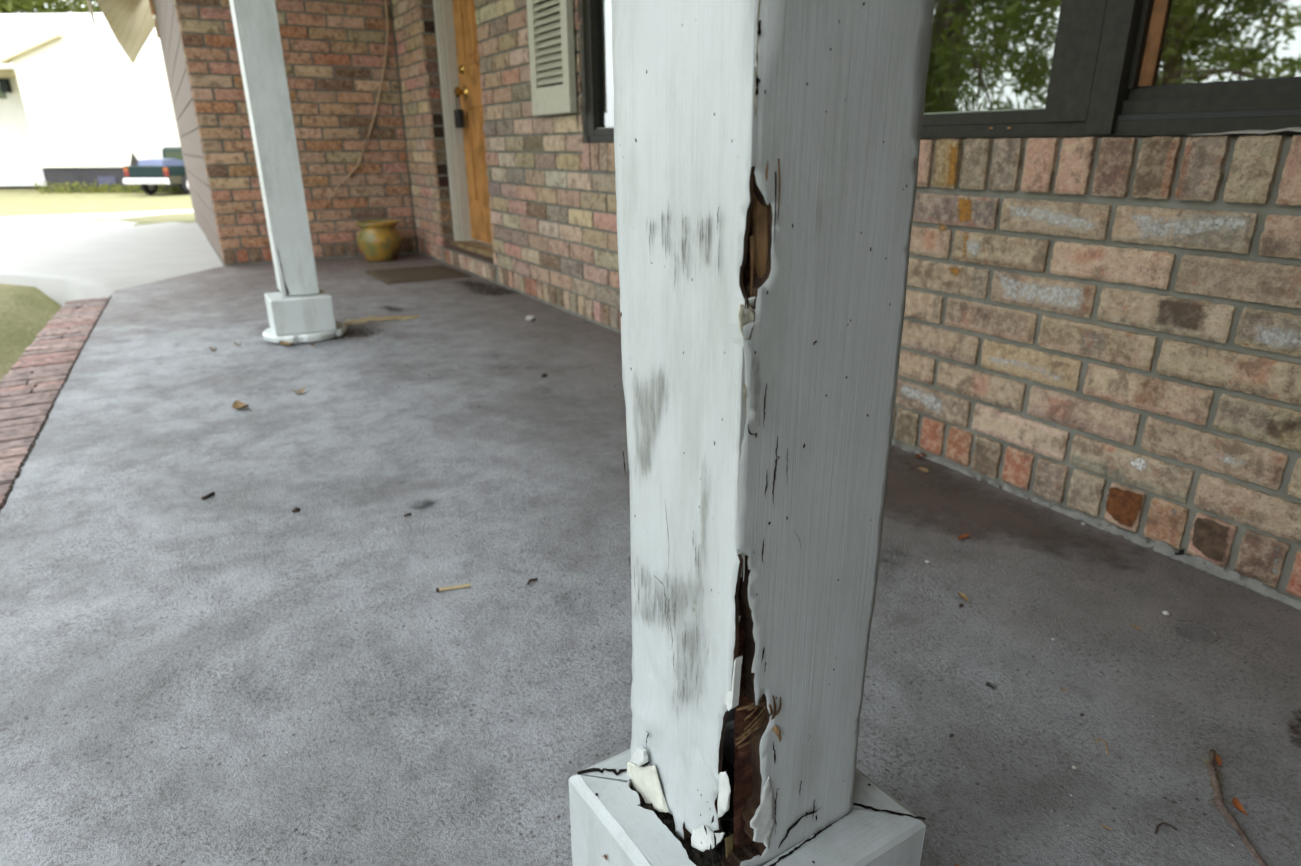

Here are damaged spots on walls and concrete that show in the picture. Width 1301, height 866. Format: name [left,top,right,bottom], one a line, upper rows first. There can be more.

peeling [738,304,755,339]
peeling [725,656,743,711]
crack [577,767,627,775]
peeling [627,731,669,813]
peeling [691,771,731,864]
peeling [750,776,775,850]
crack [769,741,926,866]